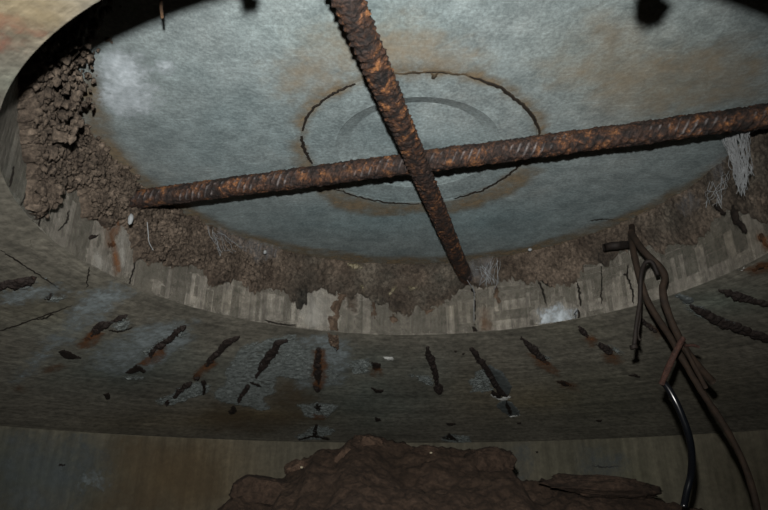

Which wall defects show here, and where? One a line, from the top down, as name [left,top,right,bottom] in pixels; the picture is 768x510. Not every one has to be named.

peeling [102,55,150,115]
rust [128,0,768,285]
crack [0,250,60,289]
crack [0,306,71,331]
crack [538,280,552,304]
peeling [541,310,571,323]
crack [574,266,603,319]
crack [623,265,634,303]
spalling [675,293,768,343]
spalling [59,314,190,380]
spalling [156,335,394,441]
spalling [454,347,522,424]